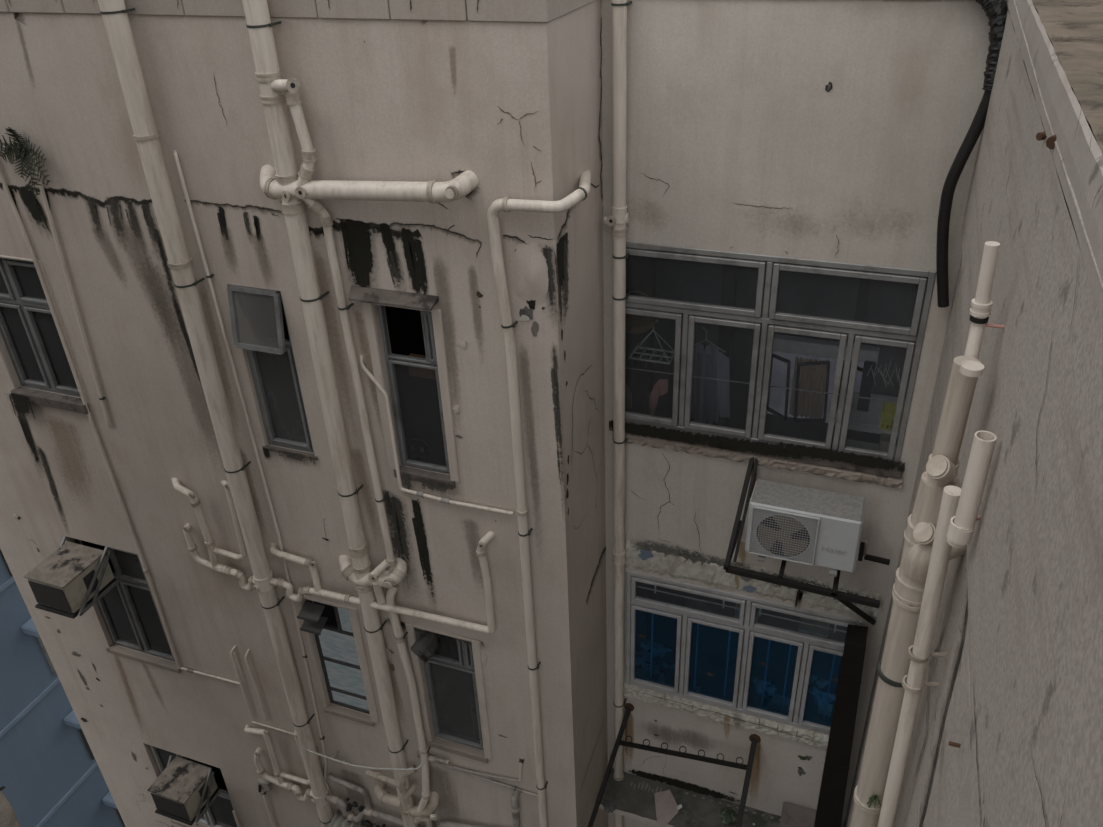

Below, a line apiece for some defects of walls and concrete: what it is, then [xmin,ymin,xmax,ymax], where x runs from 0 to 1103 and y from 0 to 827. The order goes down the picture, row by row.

crack [497,106,542,191]
crack [590,17,603,199]
damp [10,189,51,234]
crack [0,181,152,208]
damp [87,196,203,389]
crack [184,200,282,218]
damp [340,220,427,295]
crack [308,170,570,258]
damp [543,233,569,321]
damp [551,348,563,483]
damp [383,473,453,595]
crack [631,454,701,549]